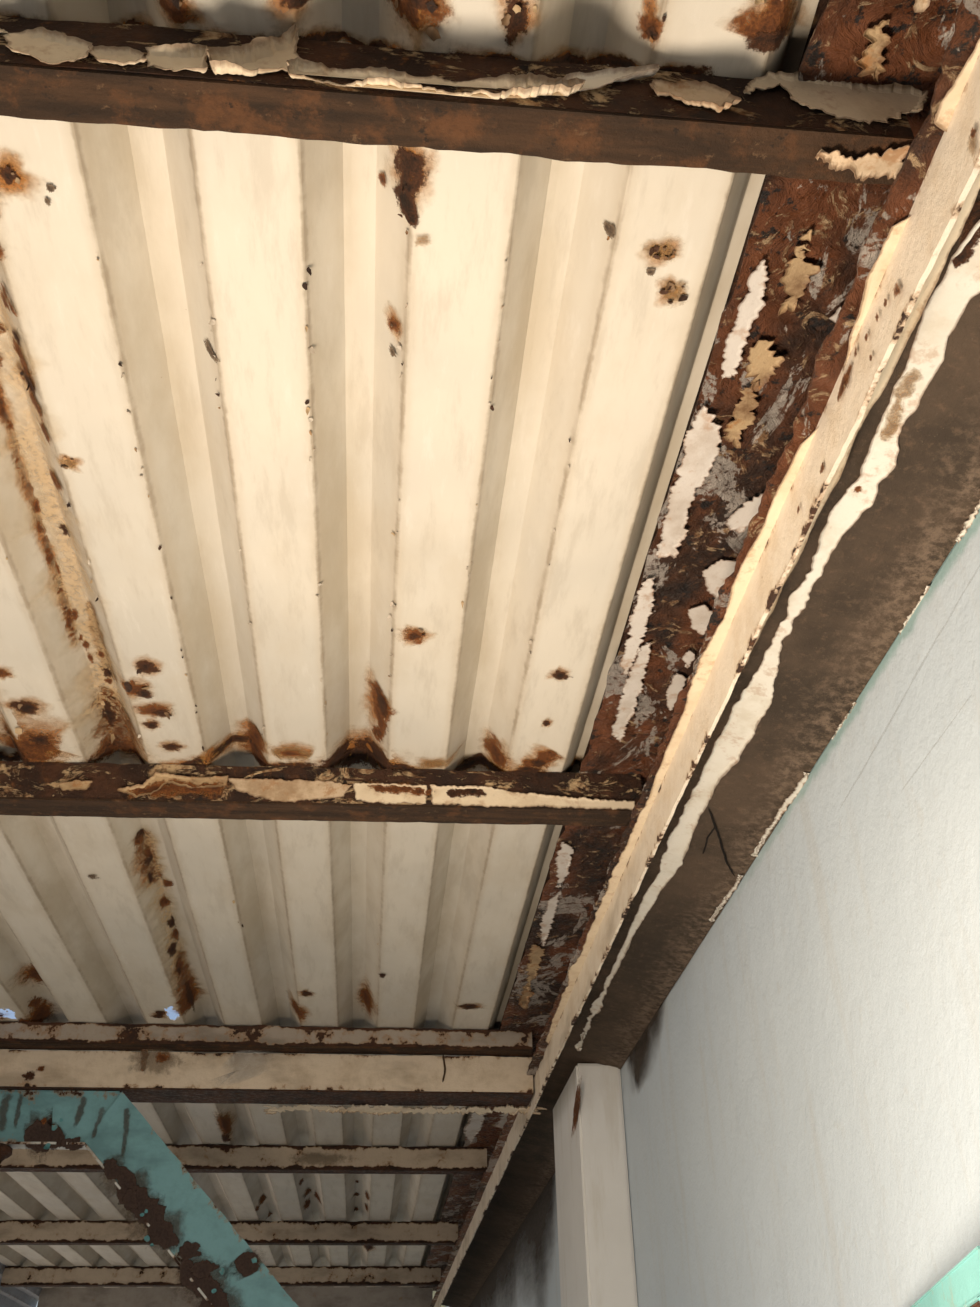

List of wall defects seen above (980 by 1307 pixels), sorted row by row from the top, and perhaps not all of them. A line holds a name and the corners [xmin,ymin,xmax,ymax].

peeling [0,19,980,132]
rust [450,0,536,60]
peeling [913,0,931,13]
rust [378,146,431,245]
peeling [815,145,910,181]
rust [0,284,50,445]
rust [0,383,171,764]
peeling [574,170,980,1051]
rust [129,679,581,799]
peeling [117,426,819,1044]
rust [135,829,202,1016]
leakage [628,1003,662,1087]